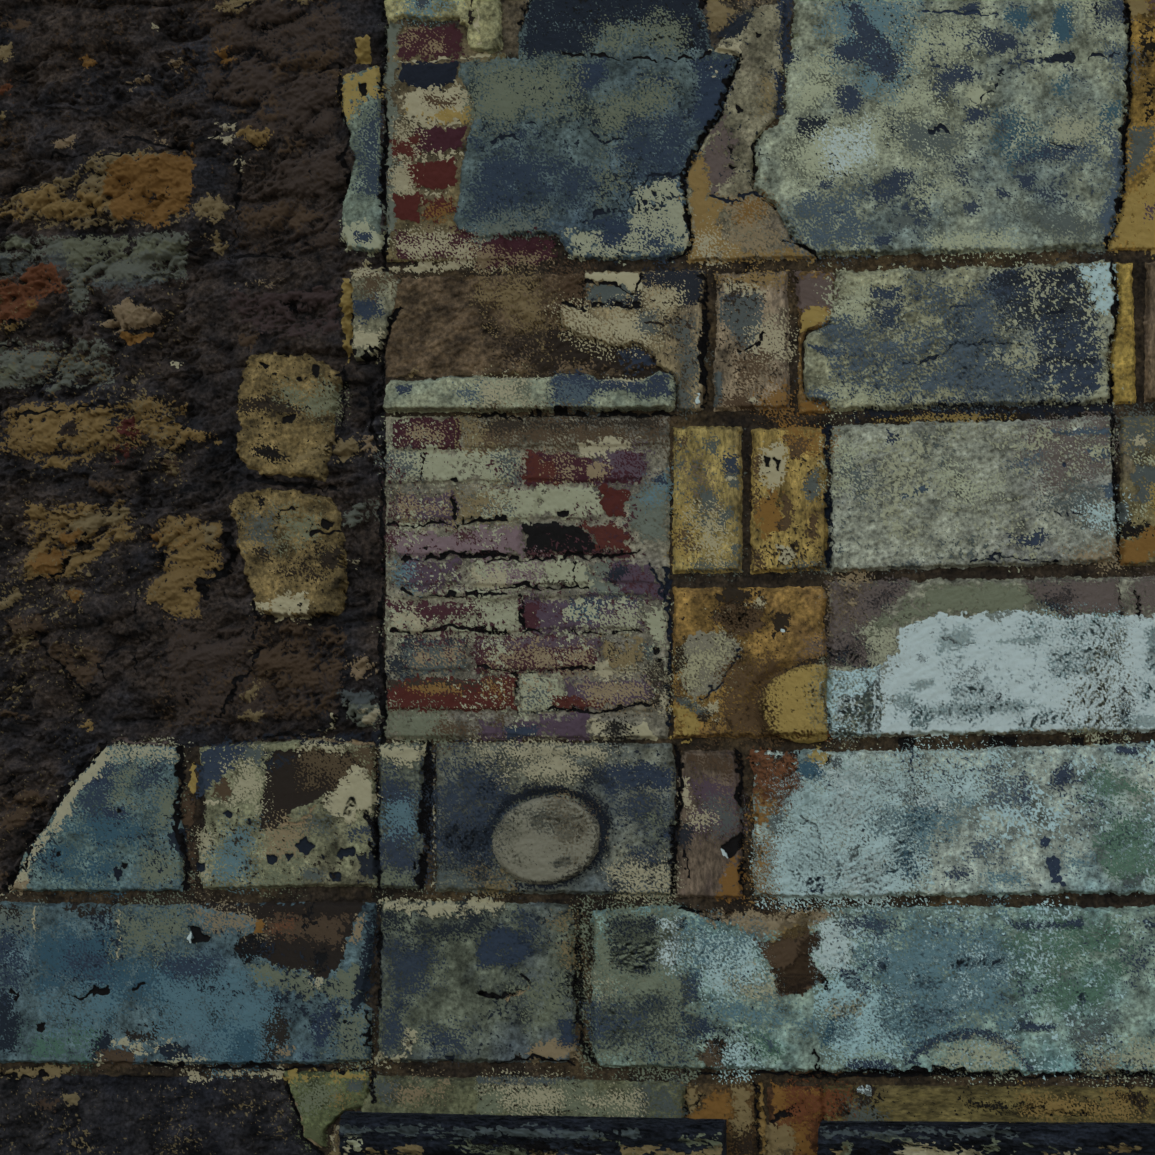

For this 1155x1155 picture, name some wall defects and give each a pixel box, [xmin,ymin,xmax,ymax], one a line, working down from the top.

spalling [510,55,615,180]